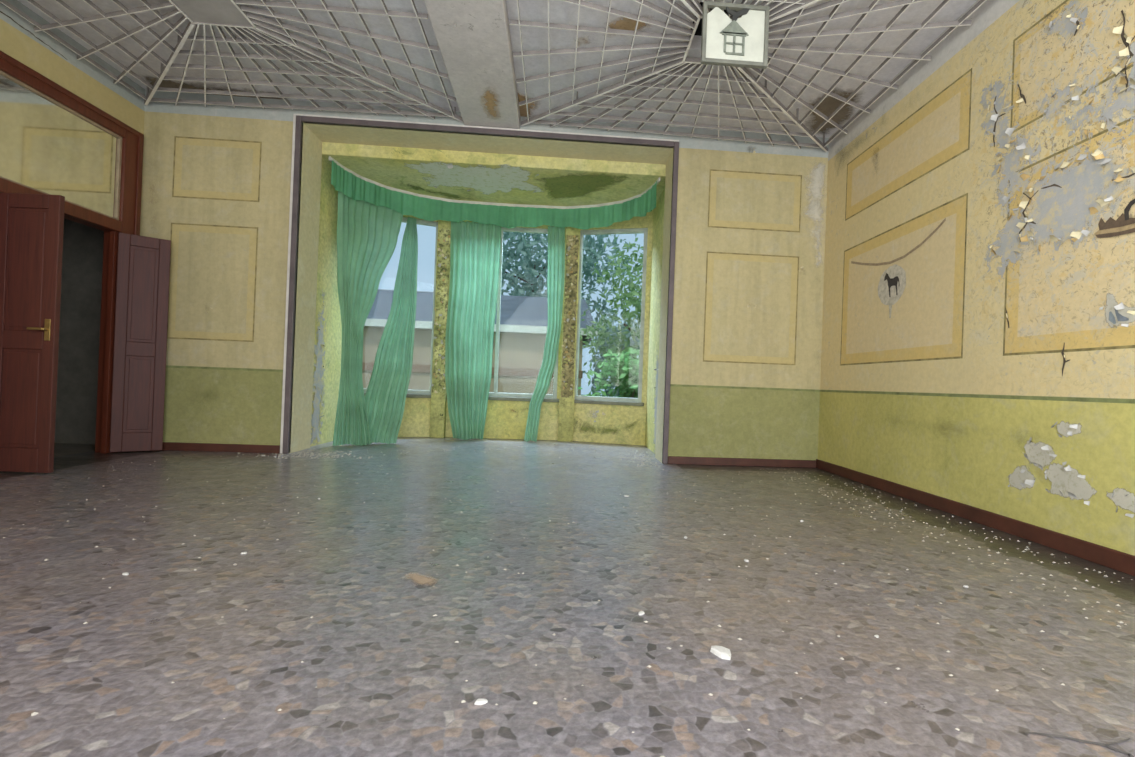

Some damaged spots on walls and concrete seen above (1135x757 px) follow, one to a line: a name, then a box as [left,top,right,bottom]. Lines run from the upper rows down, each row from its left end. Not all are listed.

peeling [1042,0,1088,46]
crack [1112,9,1135,92]
peeling [979,36,1135,282]
spalling [1099,290,1135,329]
spalling [1007,421,1135,518]